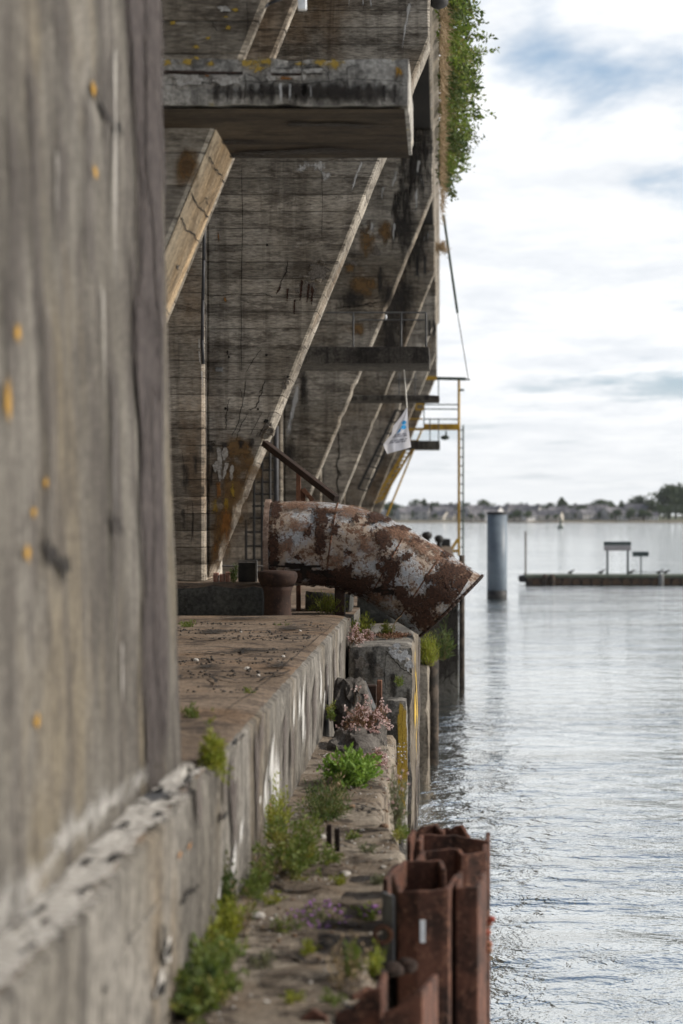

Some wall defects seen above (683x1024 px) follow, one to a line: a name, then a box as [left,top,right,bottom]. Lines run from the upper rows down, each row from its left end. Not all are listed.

leakage [213,81,397,102]
crack [181,152,377,438]
rust [360,222,391,256]
leakage [378,129,433,347]
rust [211,438,261,570]